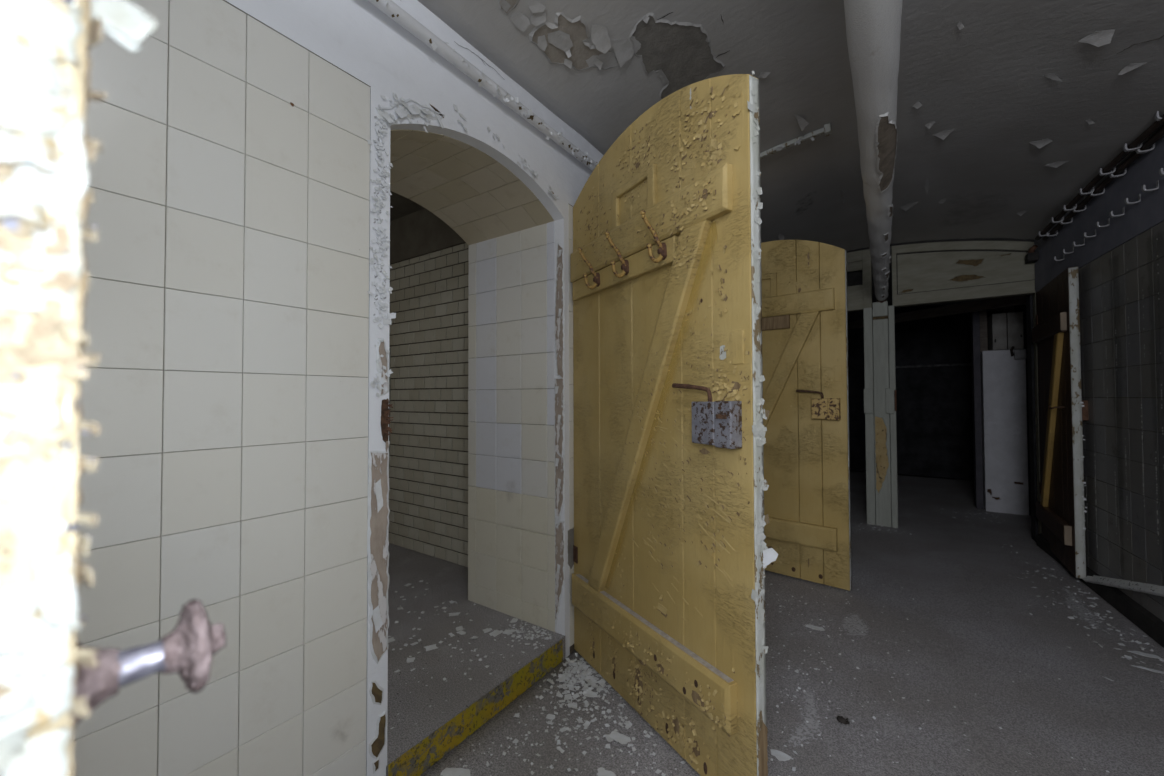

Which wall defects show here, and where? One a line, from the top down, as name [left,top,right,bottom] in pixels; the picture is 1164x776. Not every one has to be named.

peeling [1078,29,1115,47]
peeling [85,138,104,162]
peeling [498,0,771,279]
peeling [875,112,898,192]
flaking render [367,93,468,664]
peeling [79,456,99,472]
peeling [554,242,574,631]
peeling [76,512,98,586]
peeling [622,331,778,689]
peeling [75,648,99,668]
peeling [73,697,90,718]
flaking render [369,681,387,774]